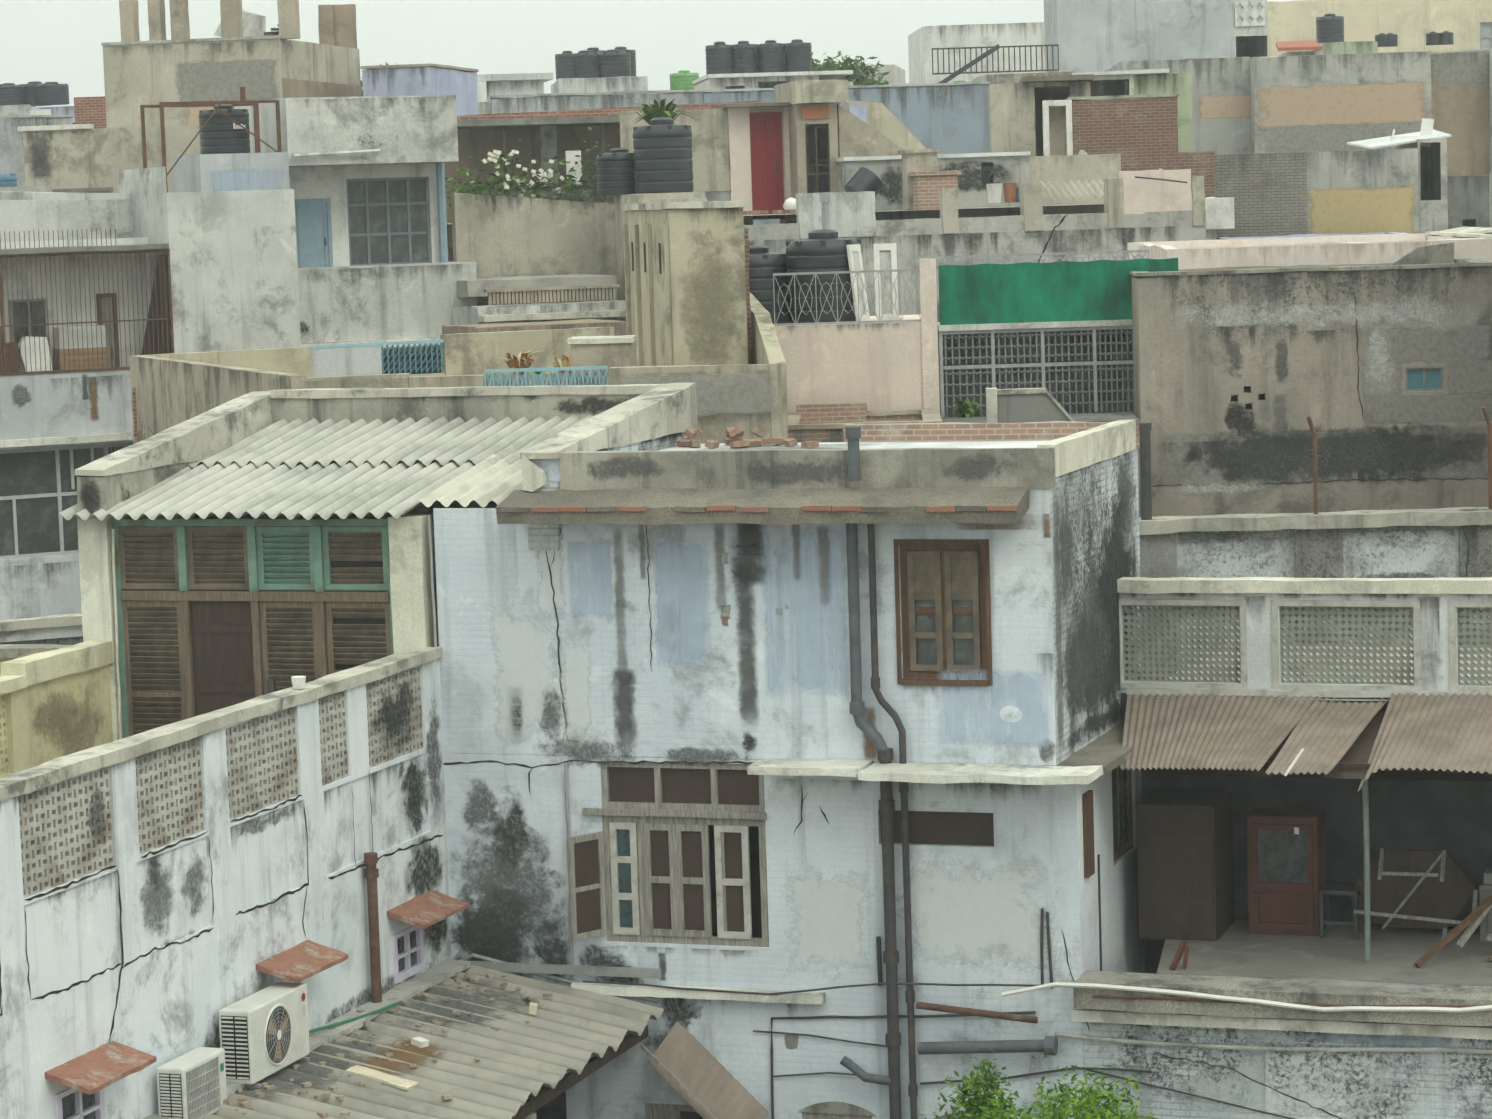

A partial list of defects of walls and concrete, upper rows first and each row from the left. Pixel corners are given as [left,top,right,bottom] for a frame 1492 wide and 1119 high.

damp [1159,267,1488,493]
crack [444,524,754,796]
damp [668,523,767,764]
damp [1040,452,1154,761]
damp [1178,526,1439,634]
damp [371,671,442,896]
mould [141,855,204,950]
damp [206,1027,220,1048]
crack [0,773,443,1042]
damp [328,782,639,1022]
damp [648,947,671,980]
damp [645,998,697,1047]